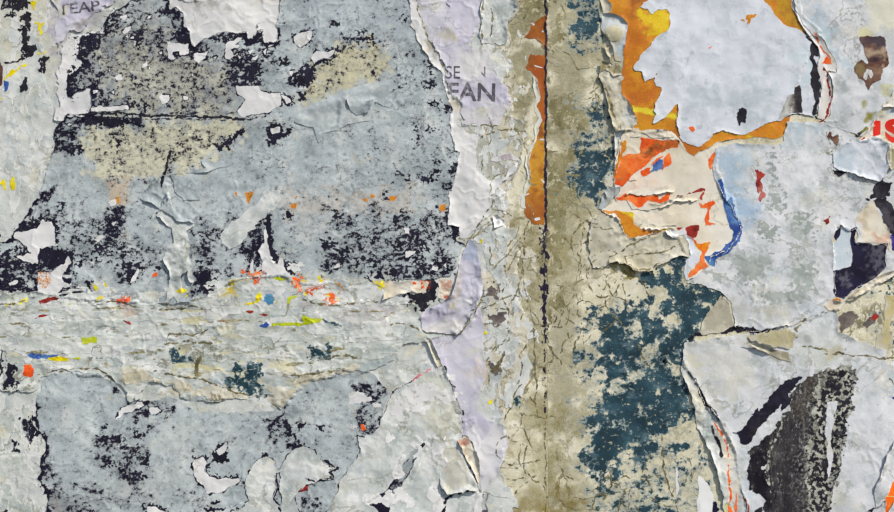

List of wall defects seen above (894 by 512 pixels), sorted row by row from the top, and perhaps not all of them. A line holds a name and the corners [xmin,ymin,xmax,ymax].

peeling [18,11,50,74]
peeling [158,37,272,63]
peeling [291,29,335,66]
peeling [90,104,129,113]
peeling [236,84,291,118]
peeling [11,217,73,294]
peeling [483,283,501,300]
peeling [115,400,162,421]
peeling [349,391,381,407]
peeling [811,370,853,478]
peeling [192,455,241,496]
peeling [811,489,832,512]